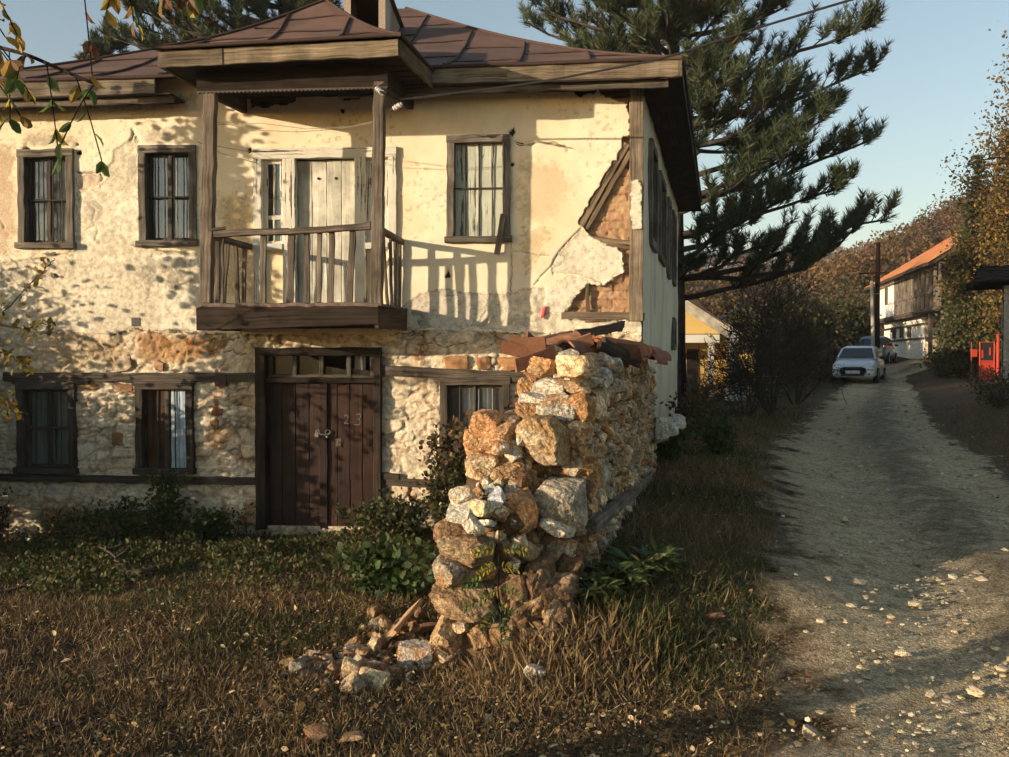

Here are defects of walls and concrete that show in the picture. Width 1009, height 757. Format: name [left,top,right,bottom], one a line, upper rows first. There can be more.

crack [516,140,566,148]
peeling [403,230,641,334]